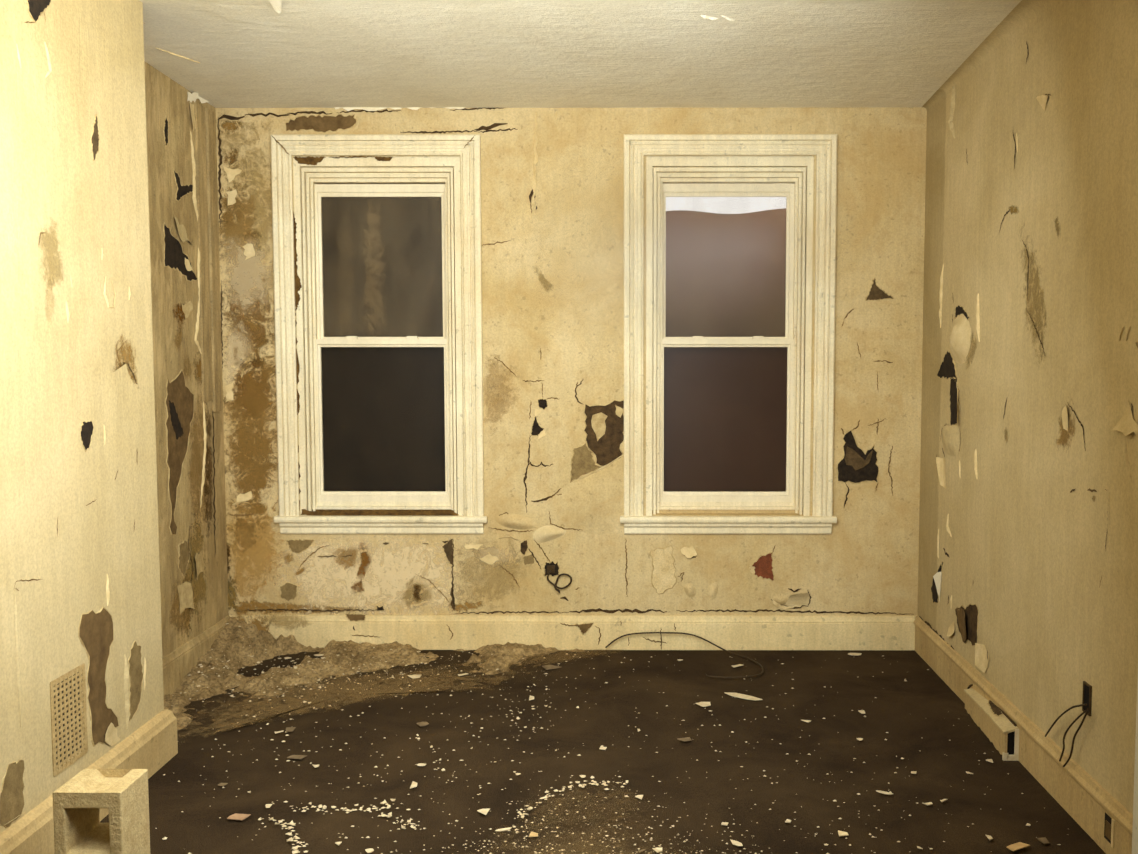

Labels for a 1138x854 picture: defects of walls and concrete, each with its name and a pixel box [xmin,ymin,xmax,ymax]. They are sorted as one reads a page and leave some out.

peeling [173,92,209,354]
peeling [226,189,237,205]
crack [217,108,517,227]
crack [217,281,225,368]
peeling [228,491,256,516]
crack [523,436,562,513]
spalling [569,399,624,483]
hole [836,420,880,506]
peeling [749,546,775,582]
peeling [78,574,146,747]
peeling [933,572,989,673]
peeling [0,759,25,828]